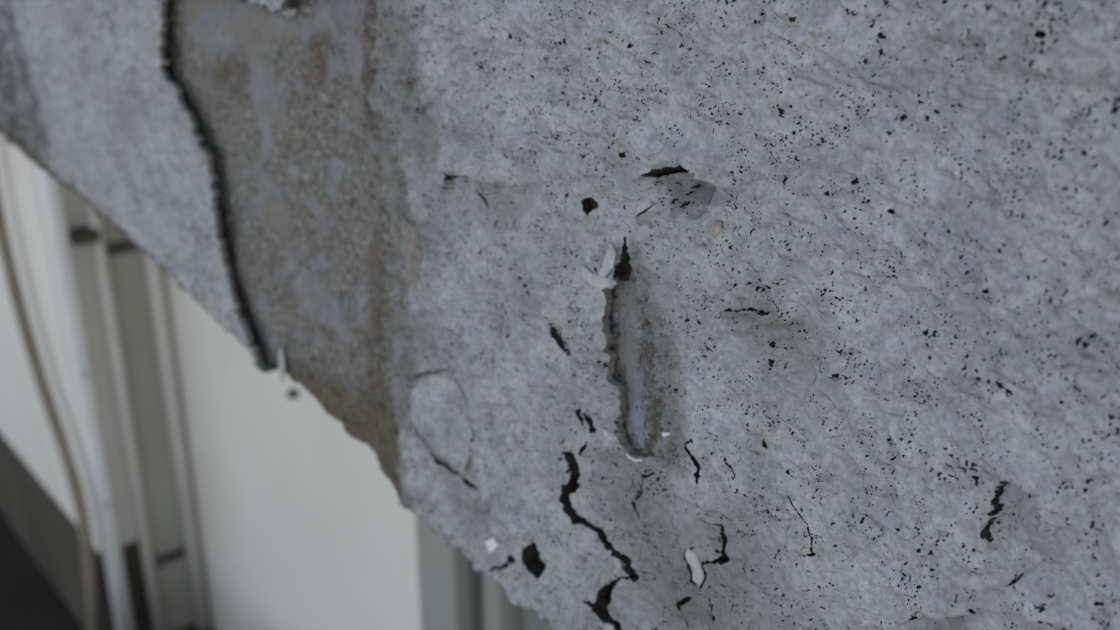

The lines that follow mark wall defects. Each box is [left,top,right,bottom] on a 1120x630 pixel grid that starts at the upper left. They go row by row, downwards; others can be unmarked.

spalling [156,0,474,503]
crack [558,409,639,630]
spalling [582,244,671,462]
crack [630,472,655,518]
crack [675,524,730,627]
crack [684,439,736,485]